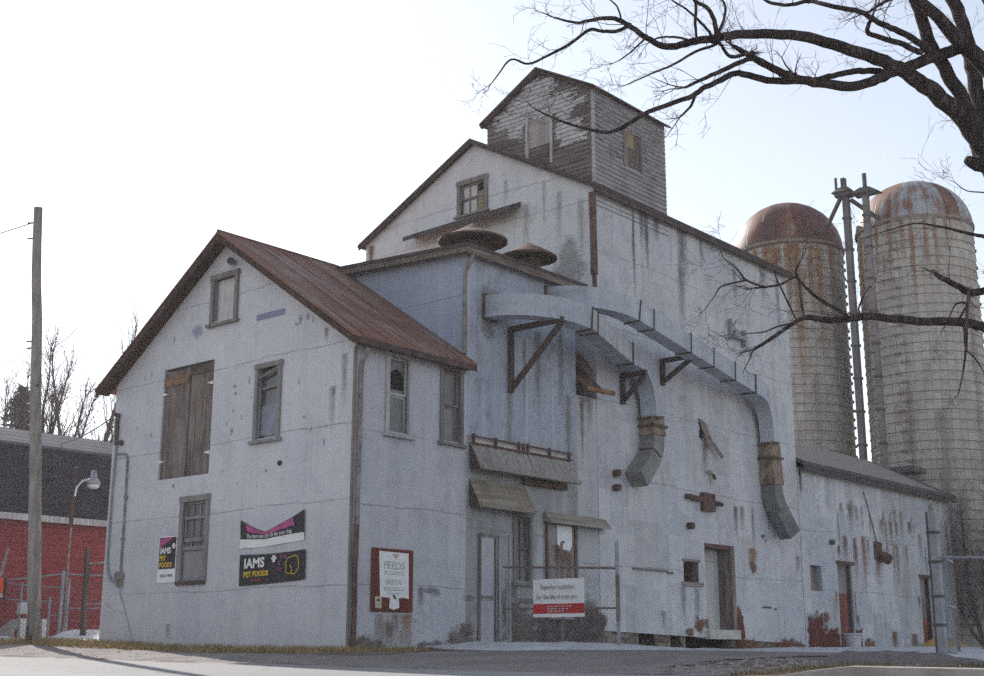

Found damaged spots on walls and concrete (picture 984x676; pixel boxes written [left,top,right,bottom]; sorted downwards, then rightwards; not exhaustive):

peeling [490,74,666,188]
rust [859,218,948,332]
rust [837,501,878,565]
peeling [808,613,842,647]